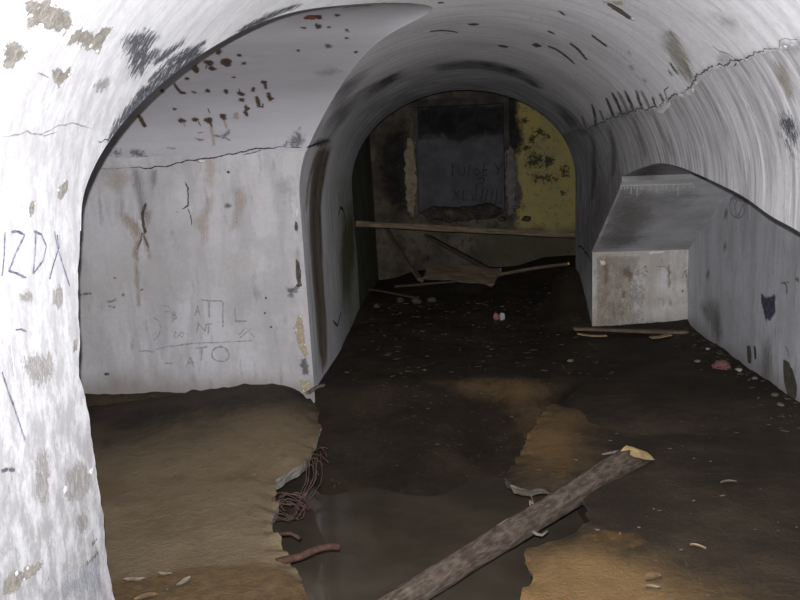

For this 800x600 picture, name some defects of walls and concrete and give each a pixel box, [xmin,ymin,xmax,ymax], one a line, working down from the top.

peeling [25,0,113,54]
peeling [3,41,28,70]
peeling [52,67,71,88]
water stain [107,27,207,143]
rust [184,49,246,80]
rust [172,81,274,141]
crack [577,38,798,131]
water stain [752,65,799,169]
crack [100,140,327,170]
water stain [523,128,570,183]
spalling [294,315,307,357]
spalling [271,428,322,543]